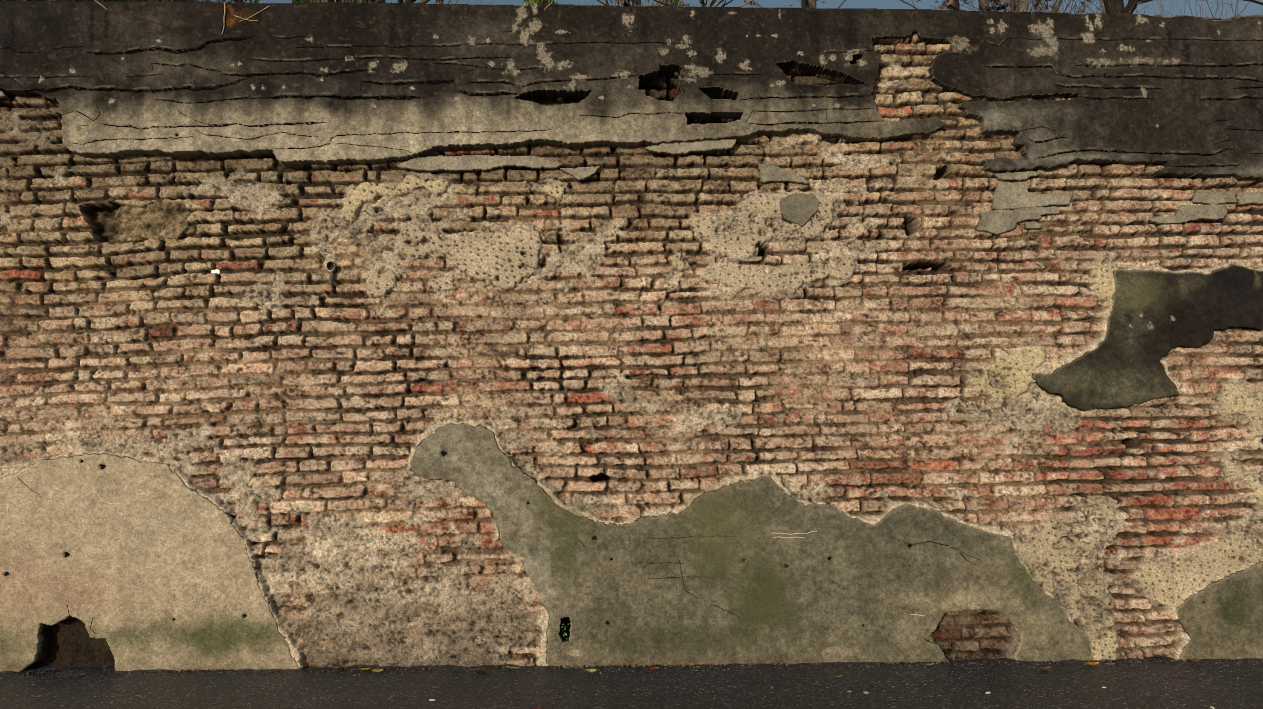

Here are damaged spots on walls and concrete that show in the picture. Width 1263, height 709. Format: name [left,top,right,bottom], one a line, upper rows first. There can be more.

crack [0,10,684,155]
crack [682,74,874,126]
crack [946,37,1263,168]
flaking render [397,155,562,172]
spalling [78,201,191,242]
spalling [340,174,451,245]
spalling [398,221,543,293]
spalling [689,187,835,259]
spalling [683,253,857,296]
spalling [1220,381,1263,442]
crack [904,541,981,565]
spalling [1012,499,1120,661]